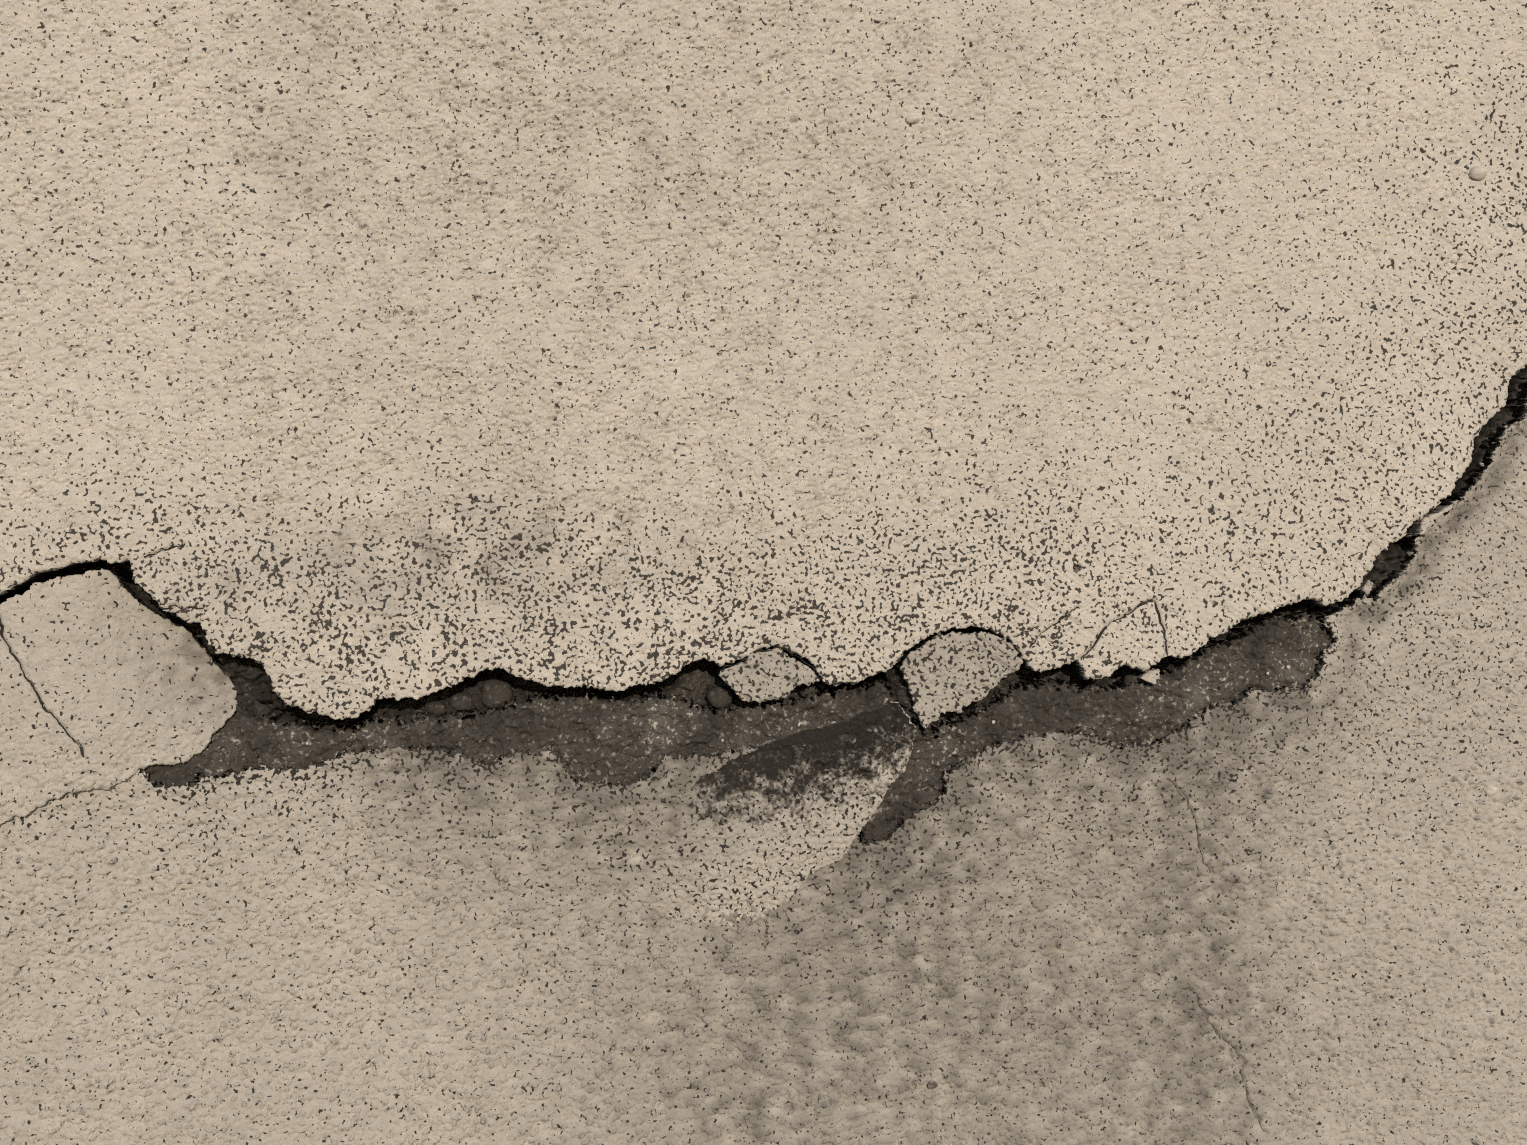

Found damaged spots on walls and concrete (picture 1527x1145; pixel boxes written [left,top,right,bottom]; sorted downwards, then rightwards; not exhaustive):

crack [1435,365,1527,508]
crack [0,537,1414,757]
spalling [140,608,1336,927]